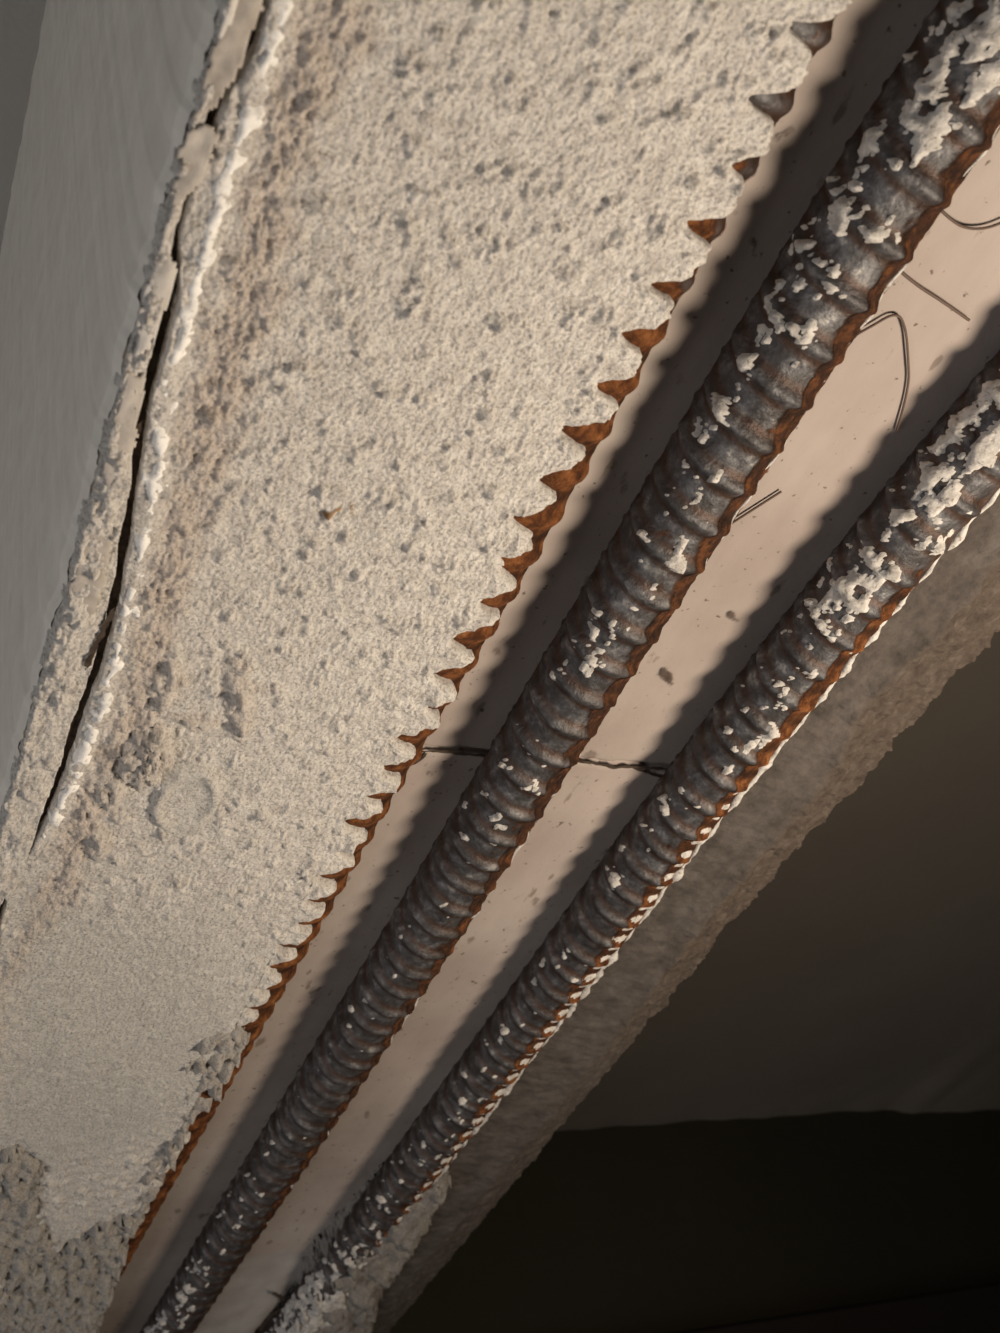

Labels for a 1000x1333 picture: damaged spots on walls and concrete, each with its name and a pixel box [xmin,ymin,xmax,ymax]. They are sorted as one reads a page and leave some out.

crack [204,87,227,126]
crack [245,0,265,55]
peeling [884,0,1000,171]
peeling [38,0,294,849]
crack [37,199,186,829]
rust [114,281,690,1290]
crack [413,750,486,765]
spalling [245,119,1000,1333]
crack [578,760,668,778]
rust [247,99,1000,1255]
peeling [175,1284,197,1329]
peeling [185,1256,210,1277]